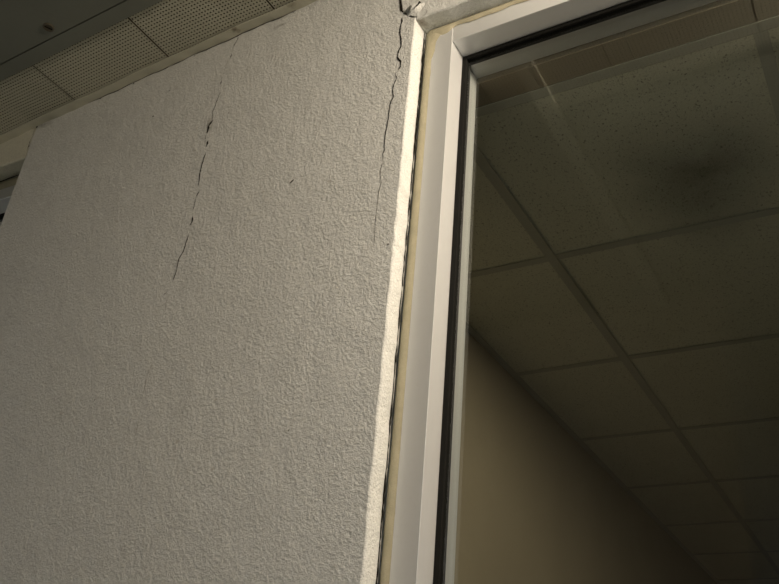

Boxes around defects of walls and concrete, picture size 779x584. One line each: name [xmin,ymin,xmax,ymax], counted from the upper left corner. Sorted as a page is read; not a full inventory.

crack [94,10,296,309]
crack [374,0,414,241]
crack [375,33,425,584]